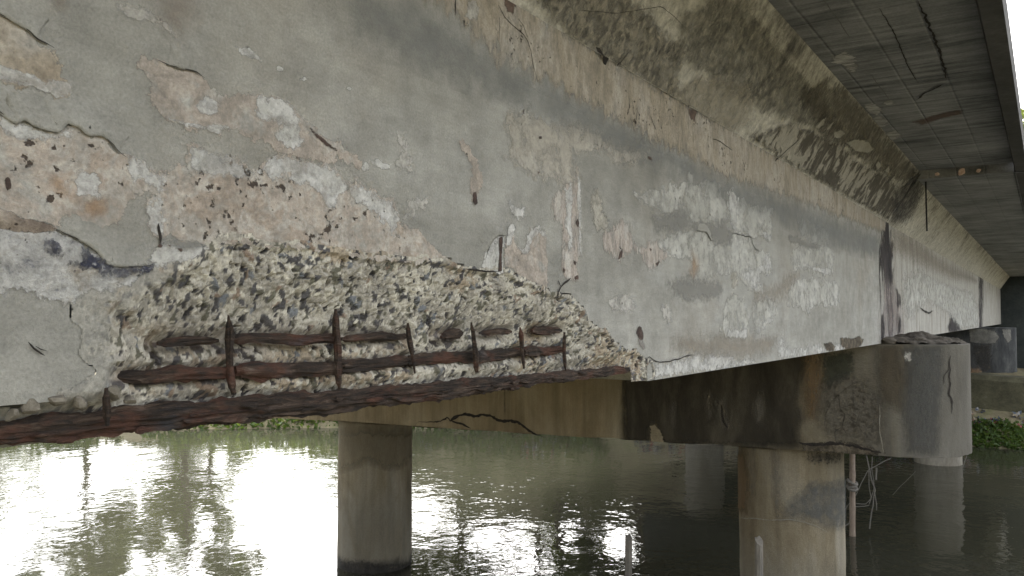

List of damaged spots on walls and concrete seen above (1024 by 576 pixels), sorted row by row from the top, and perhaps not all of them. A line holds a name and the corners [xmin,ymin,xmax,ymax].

crack [879,1,947,100]
spalling [0,0,897,446]
leakage [537,0,941,452]
crack [415,403,543,437]
leakage [622,356,807,494]
crack [943,356,953,413]